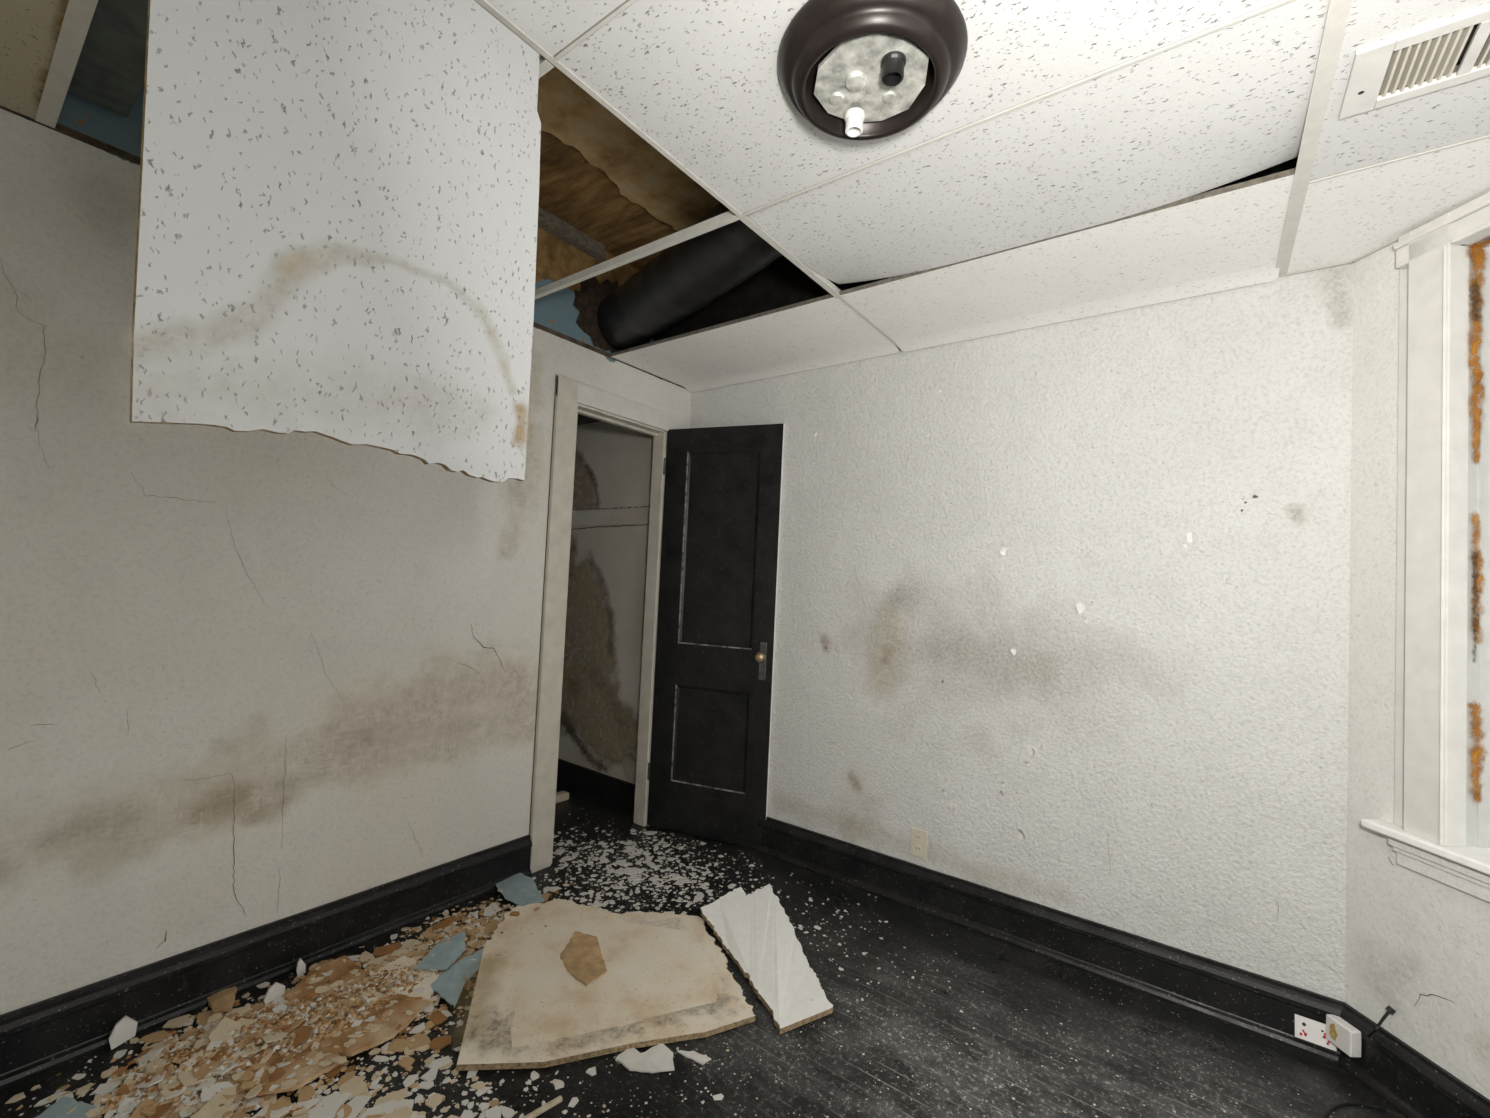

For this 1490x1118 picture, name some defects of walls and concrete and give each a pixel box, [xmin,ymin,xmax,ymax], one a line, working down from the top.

crack [0,259,48,465]
spalling [573,276,619,353]
rust [1469,239,1490,462]
rust [1472,514,1484,661]
rust [1469,703,1484,802]